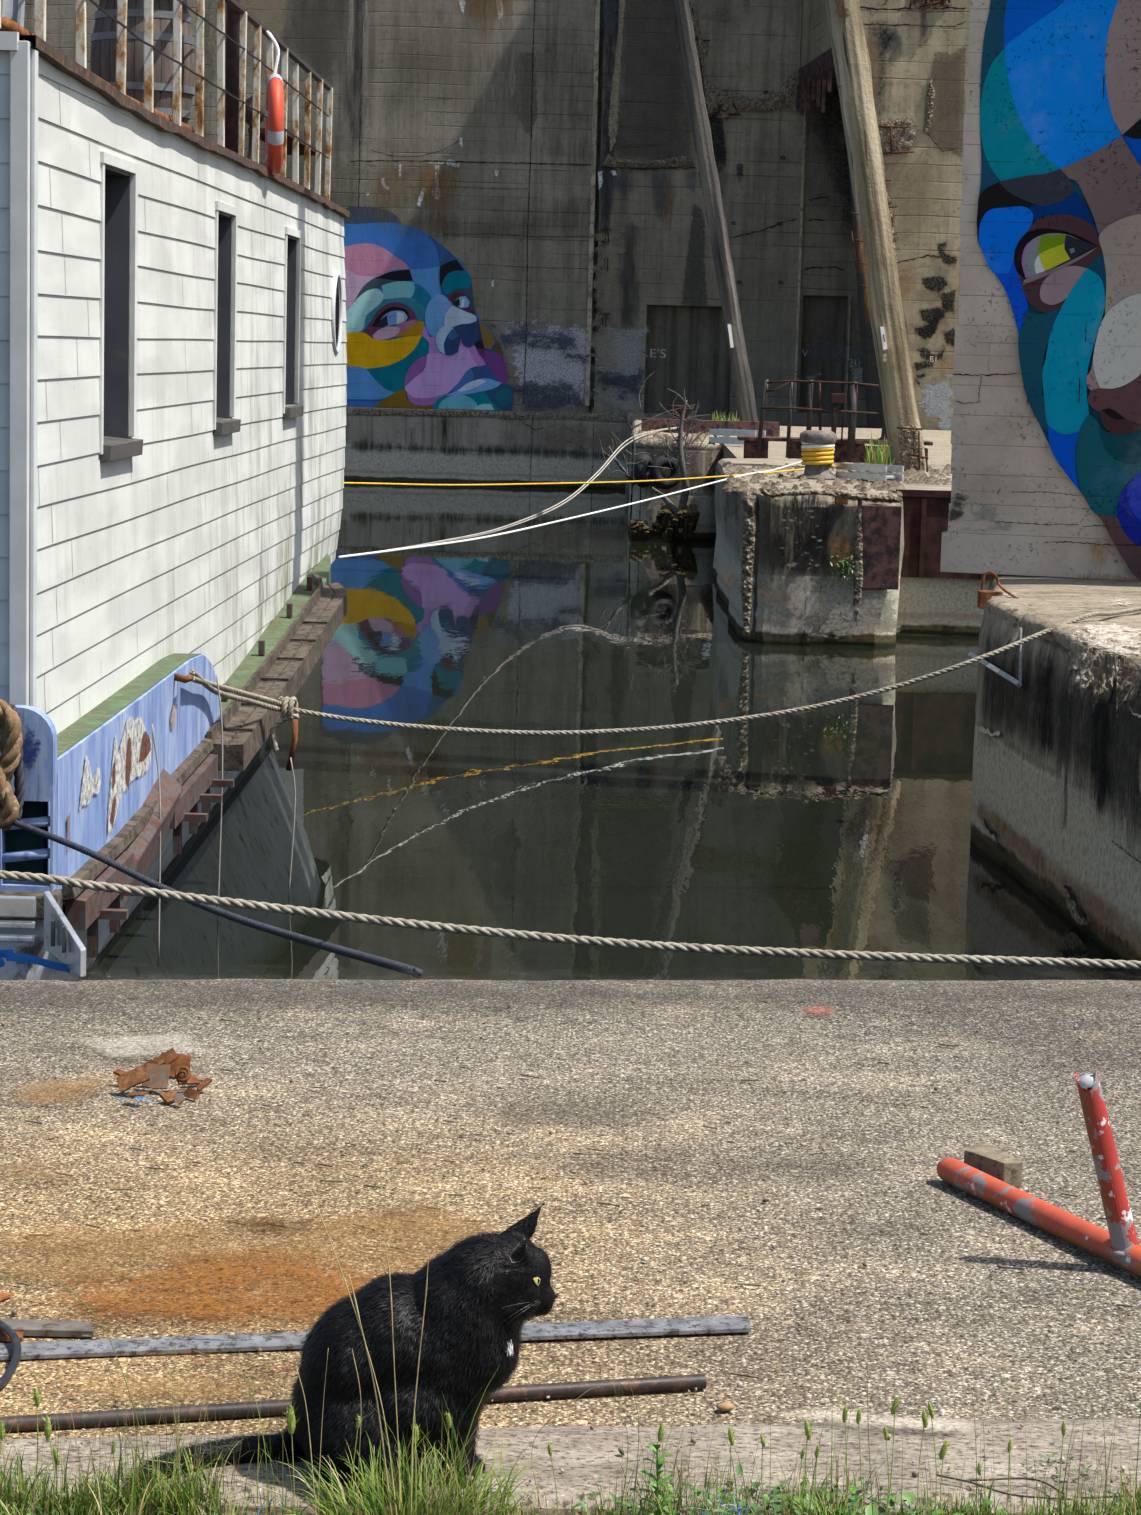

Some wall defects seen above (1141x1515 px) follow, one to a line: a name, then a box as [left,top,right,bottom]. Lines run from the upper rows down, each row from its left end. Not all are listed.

peeling [351,229,648,420]
leakage [981,621,1141,845]
spalling [1060,599,1141,759]
crack [1100,700,1141,718]